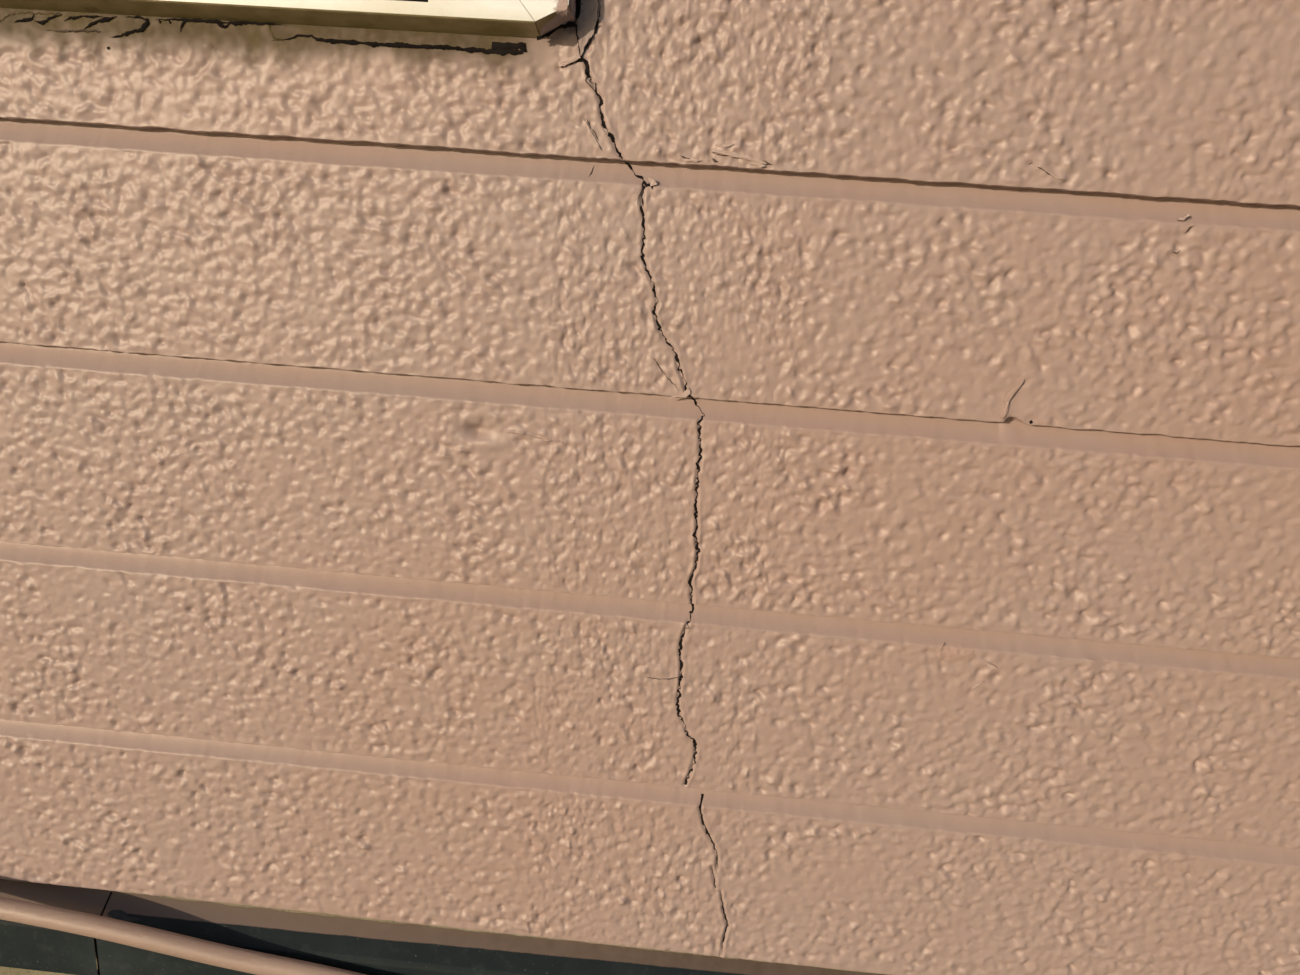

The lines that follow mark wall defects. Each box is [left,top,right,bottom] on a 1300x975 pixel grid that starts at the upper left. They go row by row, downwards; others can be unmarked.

crack [0,0,729,947]